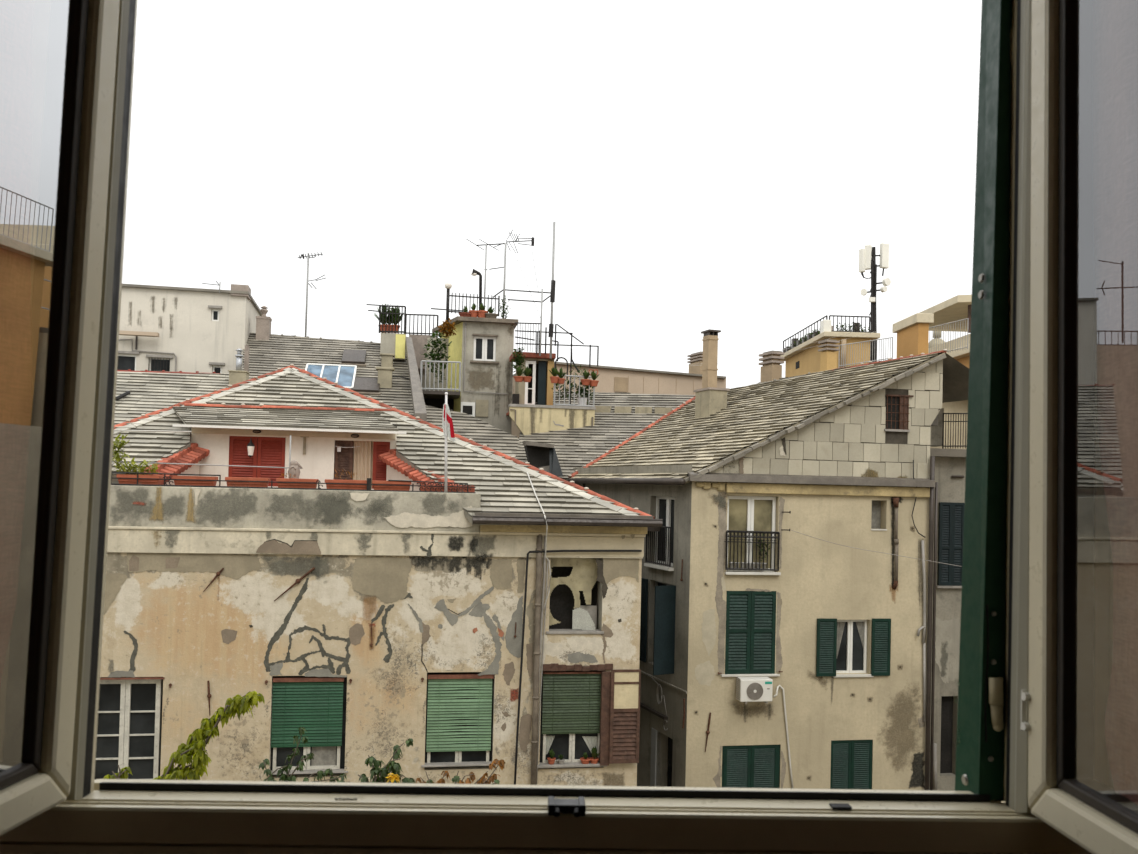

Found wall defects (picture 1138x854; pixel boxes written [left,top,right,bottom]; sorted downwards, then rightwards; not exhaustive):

damp [112,487,257,547]
damp [271,492,351,523]
damp [358,496,392,548]
damp [424,495,458,513]
flaking render [104,531,321,614]
crack [108,631,138,678]
crack [264,578,413,677]
flaking render [352,556,525,685]
damp [887,691,918,766]